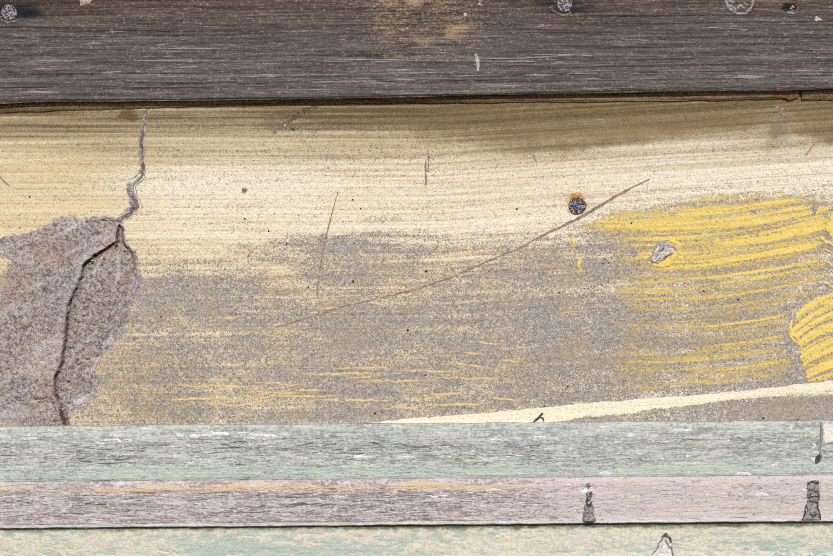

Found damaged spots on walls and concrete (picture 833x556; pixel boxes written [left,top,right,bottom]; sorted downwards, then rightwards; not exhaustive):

crack [81,107,150,246]
flaking render [49,217,142,425]
crack [35,398,67,425]